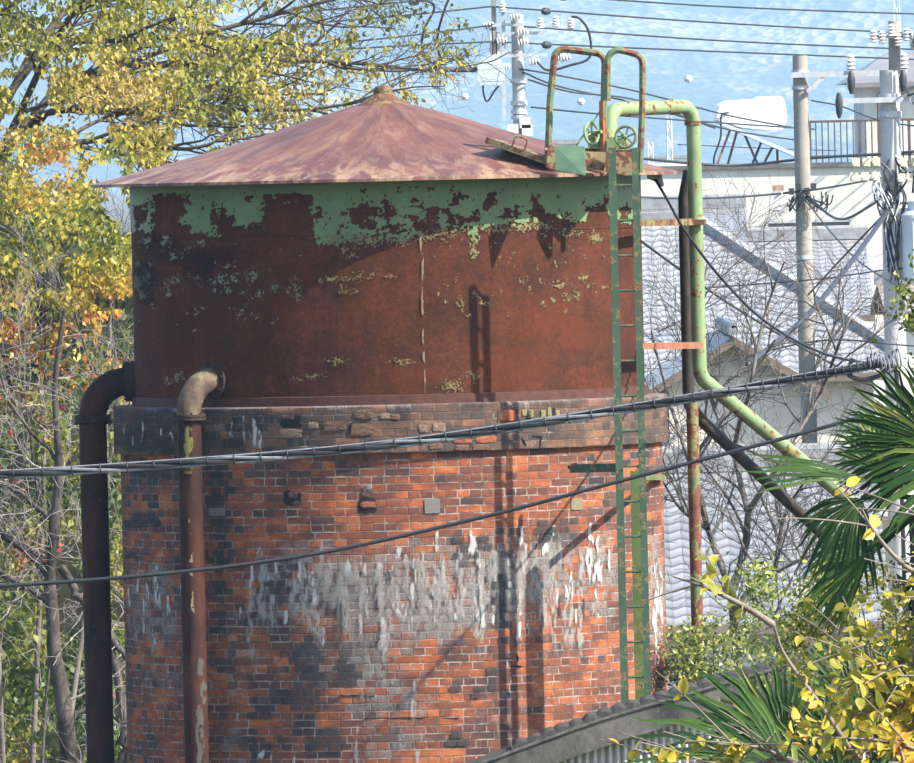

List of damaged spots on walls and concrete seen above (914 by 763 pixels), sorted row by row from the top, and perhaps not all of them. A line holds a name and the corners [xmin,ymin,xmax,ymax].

peeling [130,175,642,322]
leakage [239,523,610,692]
corrosion [195,657,207,763]